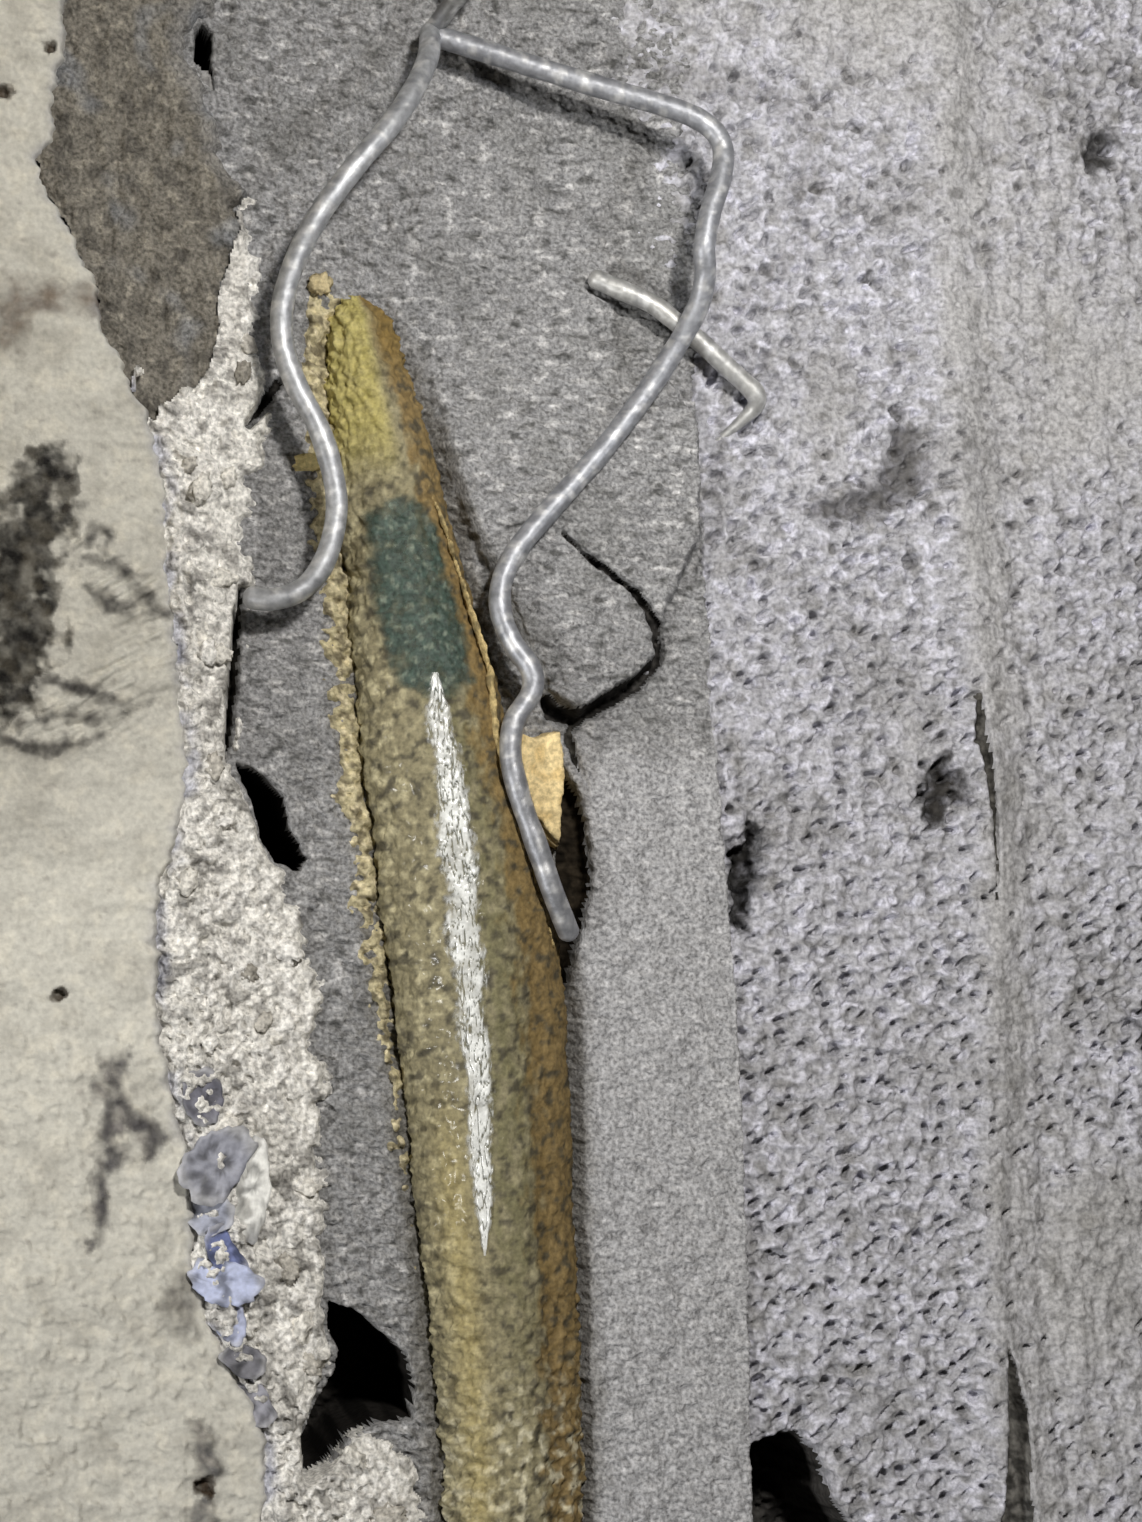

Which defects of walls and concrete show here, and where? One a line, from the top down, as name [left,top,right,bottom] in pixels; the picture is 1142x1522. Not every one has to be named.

crack [246,379,282,426]
leakage [0,445,115,722]
leakage [100,597,119,611]
crack [540,533,661,772]
leakage [9,739,73,754]
spalling [35,0,428,1522]
peeling [521,731,565,850]
crack [1001,1349,1035,1522]